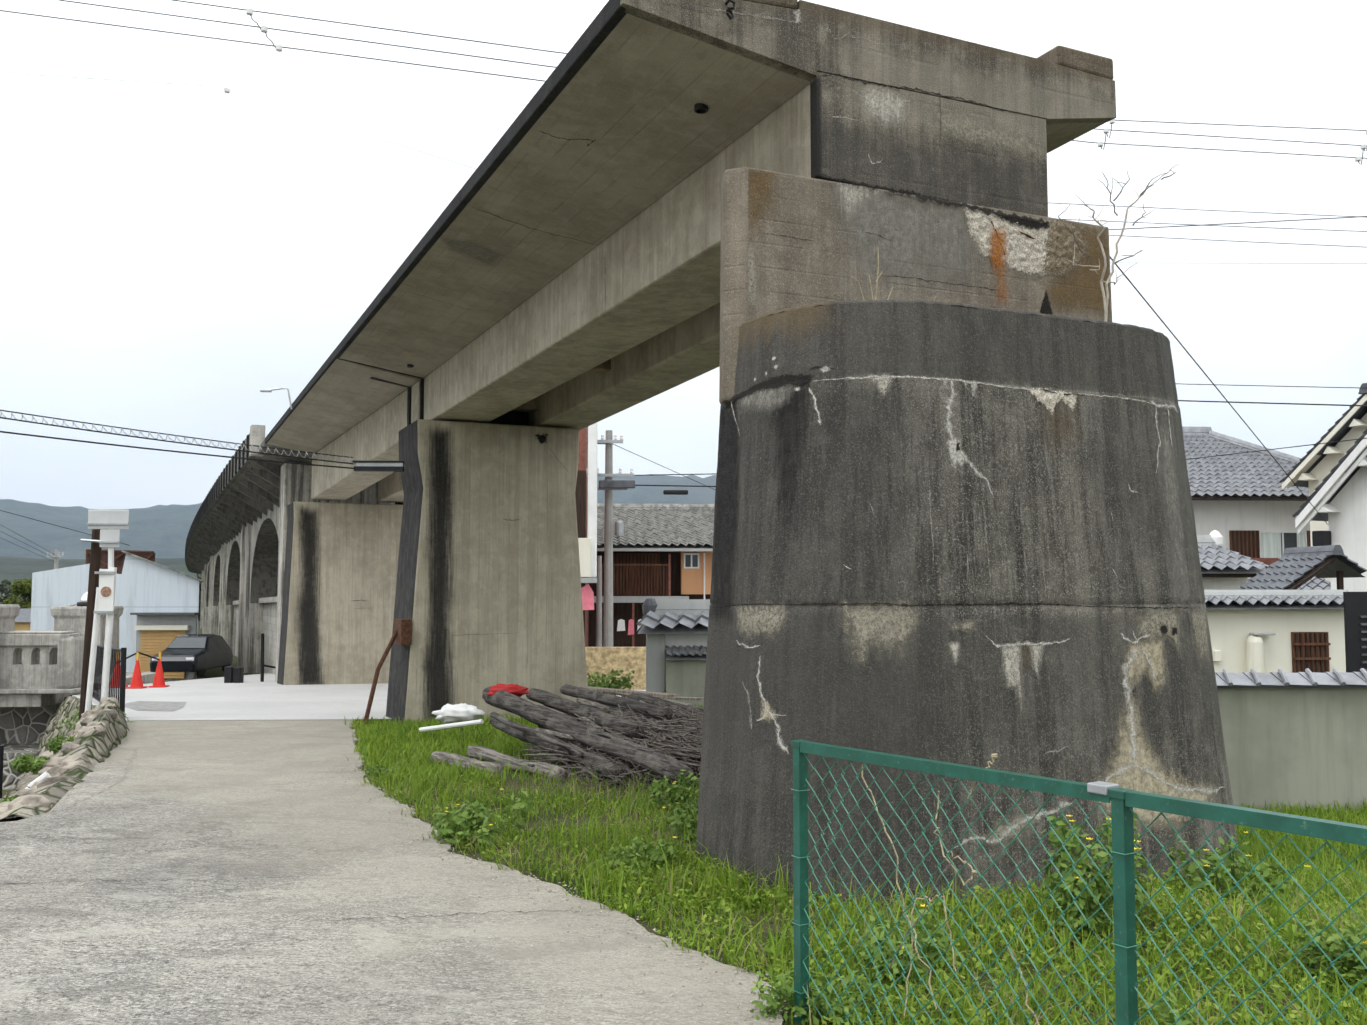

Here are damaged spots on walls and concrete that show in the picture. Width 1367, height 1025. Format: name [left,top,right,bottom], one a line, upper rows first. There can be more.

corrosion [991,231,1006,298]
spalling [964,207,1088,278]
damp [298,509,322,685]
damp [423,429,455,720]
crack [713,483,1225,848]